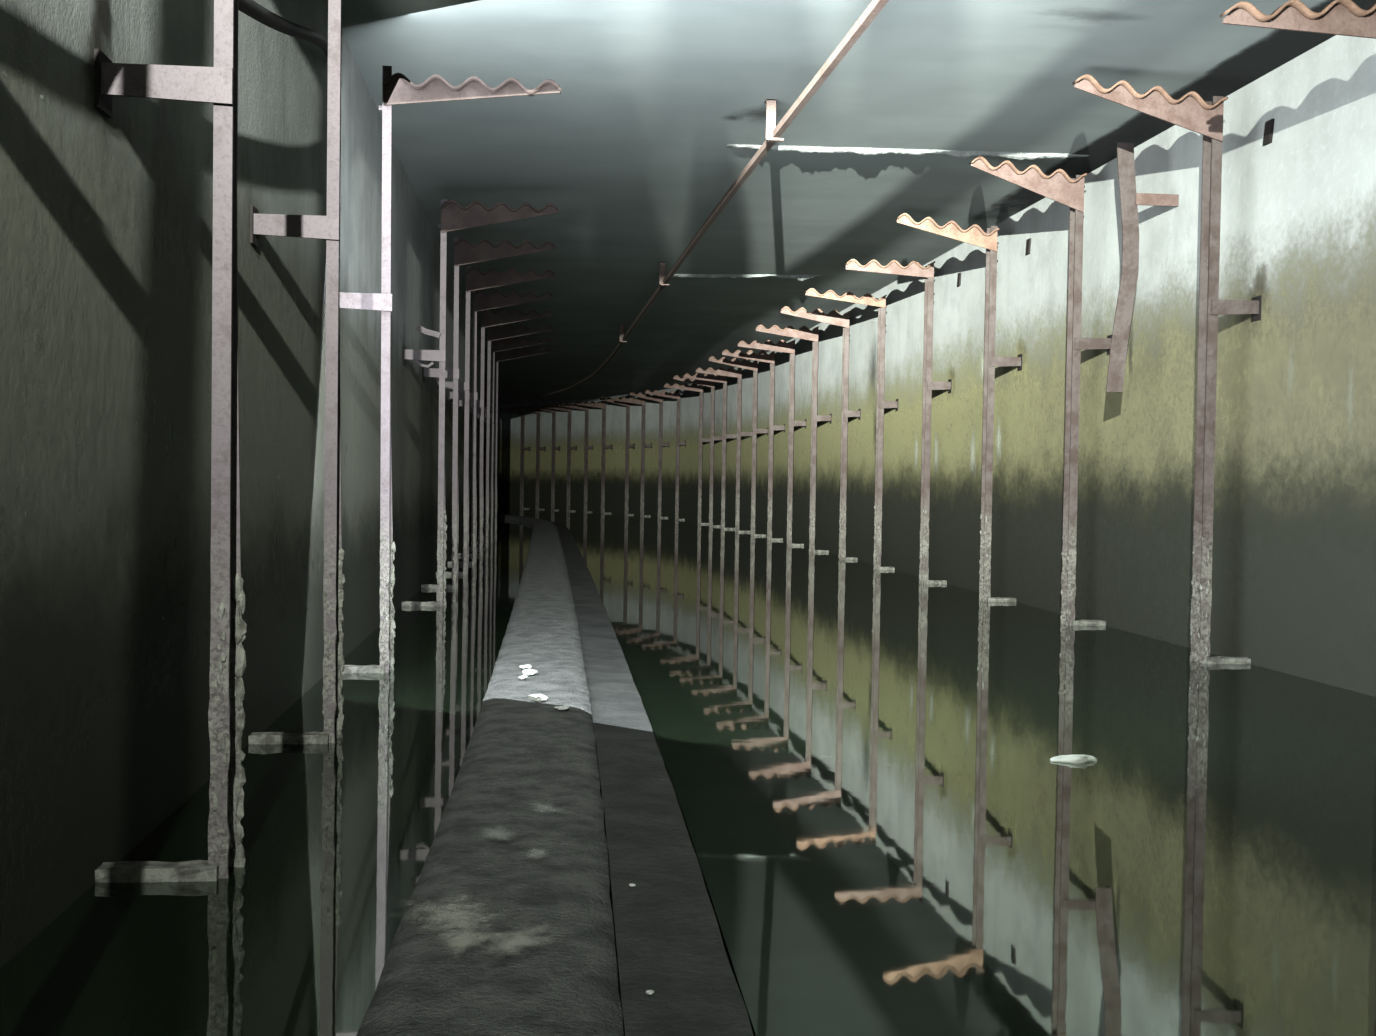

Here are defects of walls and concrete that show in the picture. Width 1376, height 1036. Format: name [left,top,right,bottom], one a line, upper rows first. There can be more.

damp [0,530,211,968]
damp [241,530,324,751]
damp [342,440,1194,658]
damp [1210,471,1376,697]